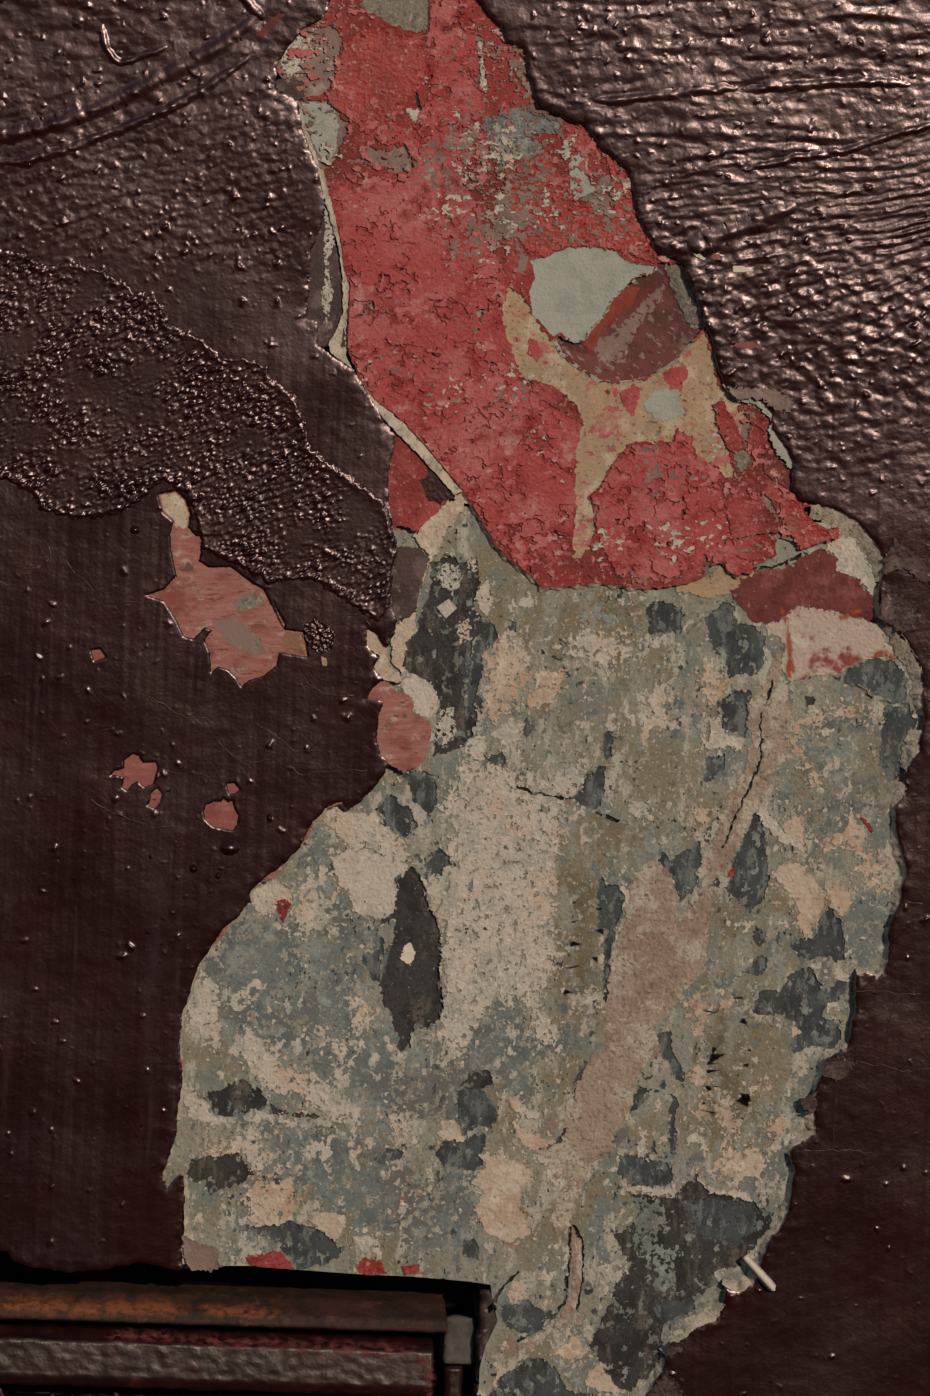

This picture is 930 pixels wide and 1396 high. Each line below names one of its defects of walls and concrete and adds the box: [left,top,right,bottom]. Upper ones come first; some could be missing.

peeling [727,385,793,414]
peeling [882,535,930,583]
peeling [148,491,327,686]
flaking render [433,596,458,621]
crack [128,640,366,776]
peeling [112,754,162,808]
crack [721,680,773,848]
peeling [204,783,239,830]
crack [796,990,930,1153]
peeling [180,1235,223,1273]
flaking render [660,1244,679,1260]
flaking render [741,1254,776,1291]